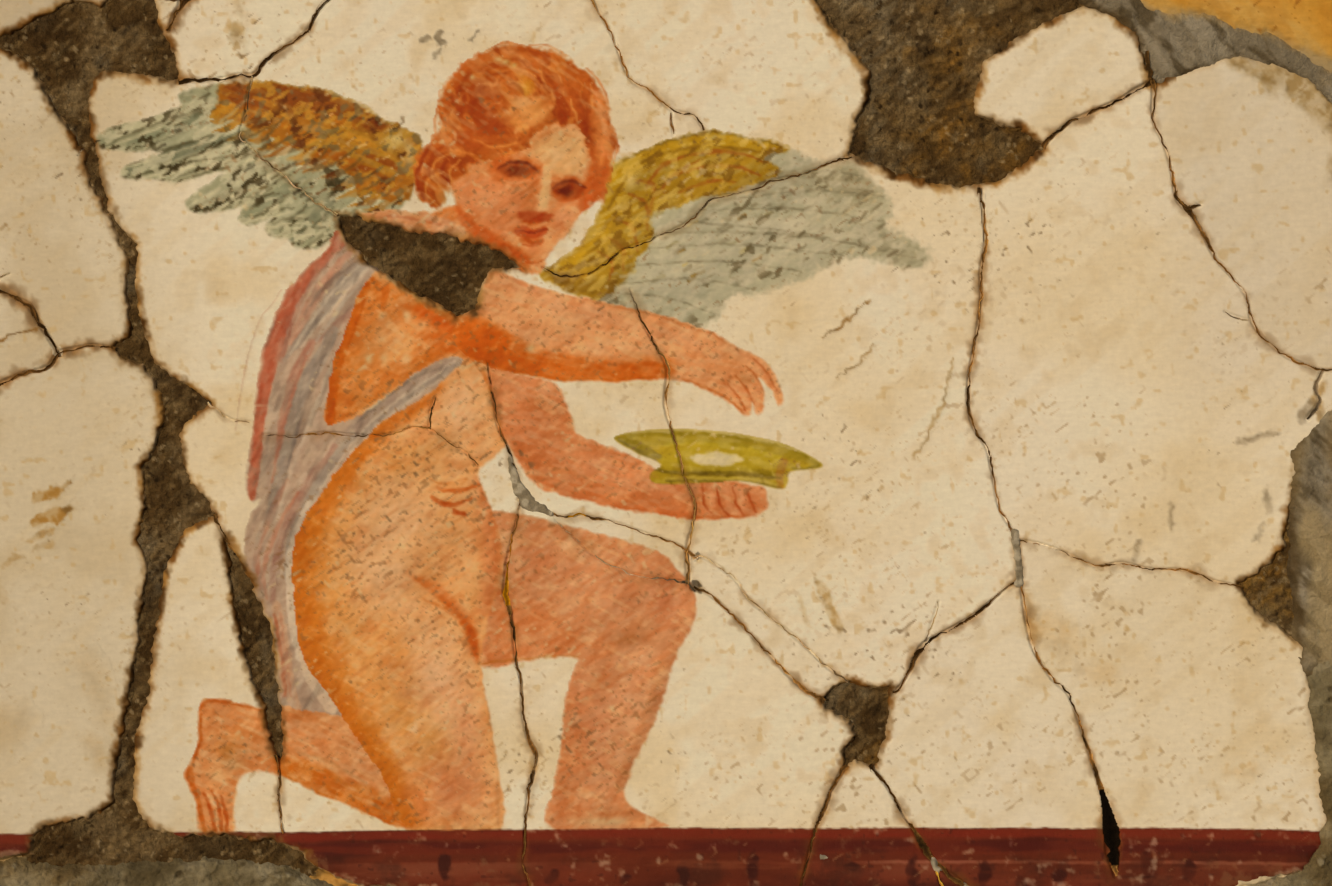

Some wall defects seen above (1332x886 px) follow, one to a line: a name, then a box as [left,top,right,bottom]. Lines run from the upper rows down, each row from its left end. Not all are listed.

crack [159,0,338,216]
crack [577,0,709,134]
flaking render [811,0,1177,197]
crack [0,274,119,398]
flaking render [330,208,533,327]
crack [1037,46,1332,420]
flaking render [0,0,357,886]
crack [207,150,859,886]
crack [891,183,1243,886]
flaking render [812,672,900,772]
crack [791,755,984,886]
flaking render [1236,874,1287,886]